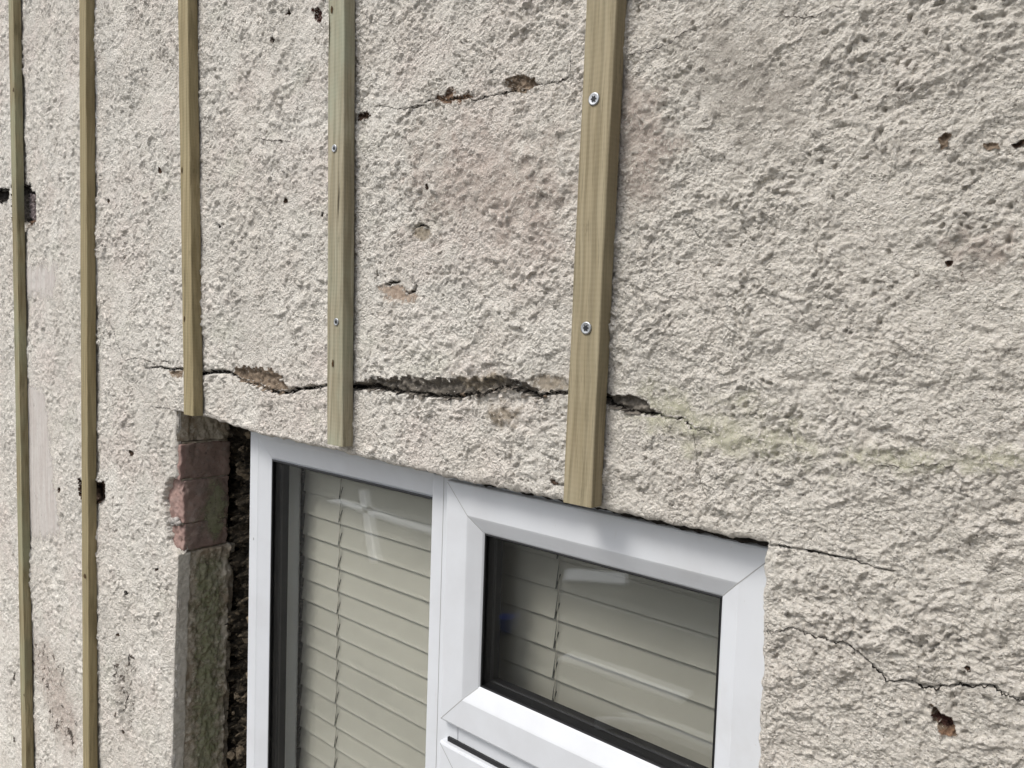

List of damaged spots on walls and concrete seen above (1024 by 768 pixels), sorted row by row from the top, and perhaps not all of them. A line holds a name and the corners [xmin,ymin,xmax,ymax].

crack [379,60,571,110]
spalling [0,184,37,229]
peeling [377,275,418,304]
crack [111,327,327,395]
crack [353,372,568,402]
crack [606,393,714,509]
crack [778,544,899,573]
crack [766,627,1024,701]
spalling [929,704,958,737]